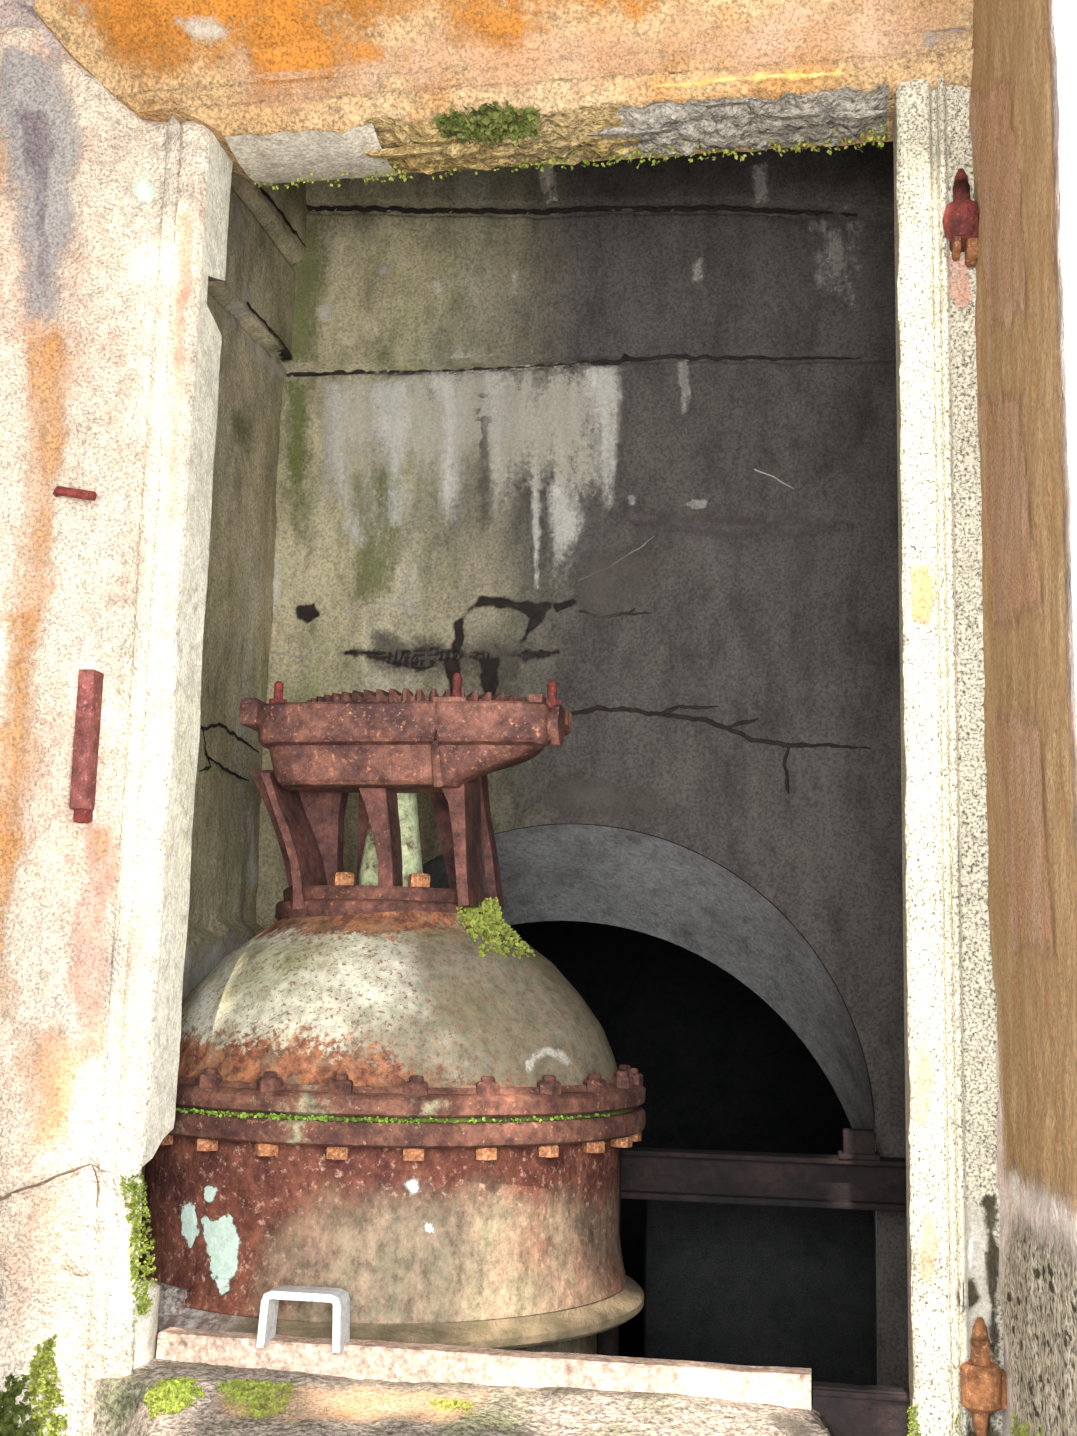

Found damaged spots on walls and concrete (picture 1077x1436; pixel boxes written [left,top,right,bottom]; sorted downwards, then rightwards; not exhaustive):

rust [71,0,953,108]
water stain [0,47,81,319]
rust [161,217,192,635]
water stain [323,354,853,548]
crack [272,596,649,696]
rust [911,565,936,622]
rust [951,0,1077,1211]
crack [200,723,259,781]
crack [571,705,871,794]
crack [0,1164,117,1206]